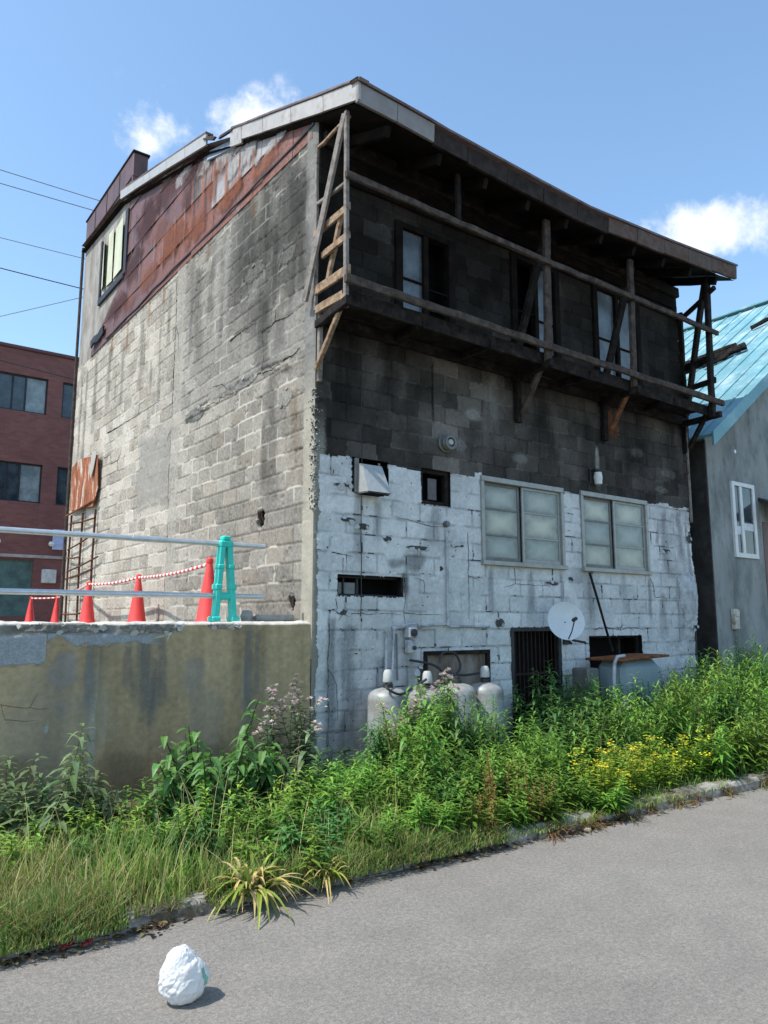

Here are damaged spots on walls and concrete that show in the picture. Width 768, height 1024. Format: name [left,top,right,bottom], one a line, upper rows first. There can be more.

peeling [176,131,284,188]
rust [108,141,276,319]
crack [197,307,300,430]
peeling [0,621,184,667]
crack [327,578,438,733]